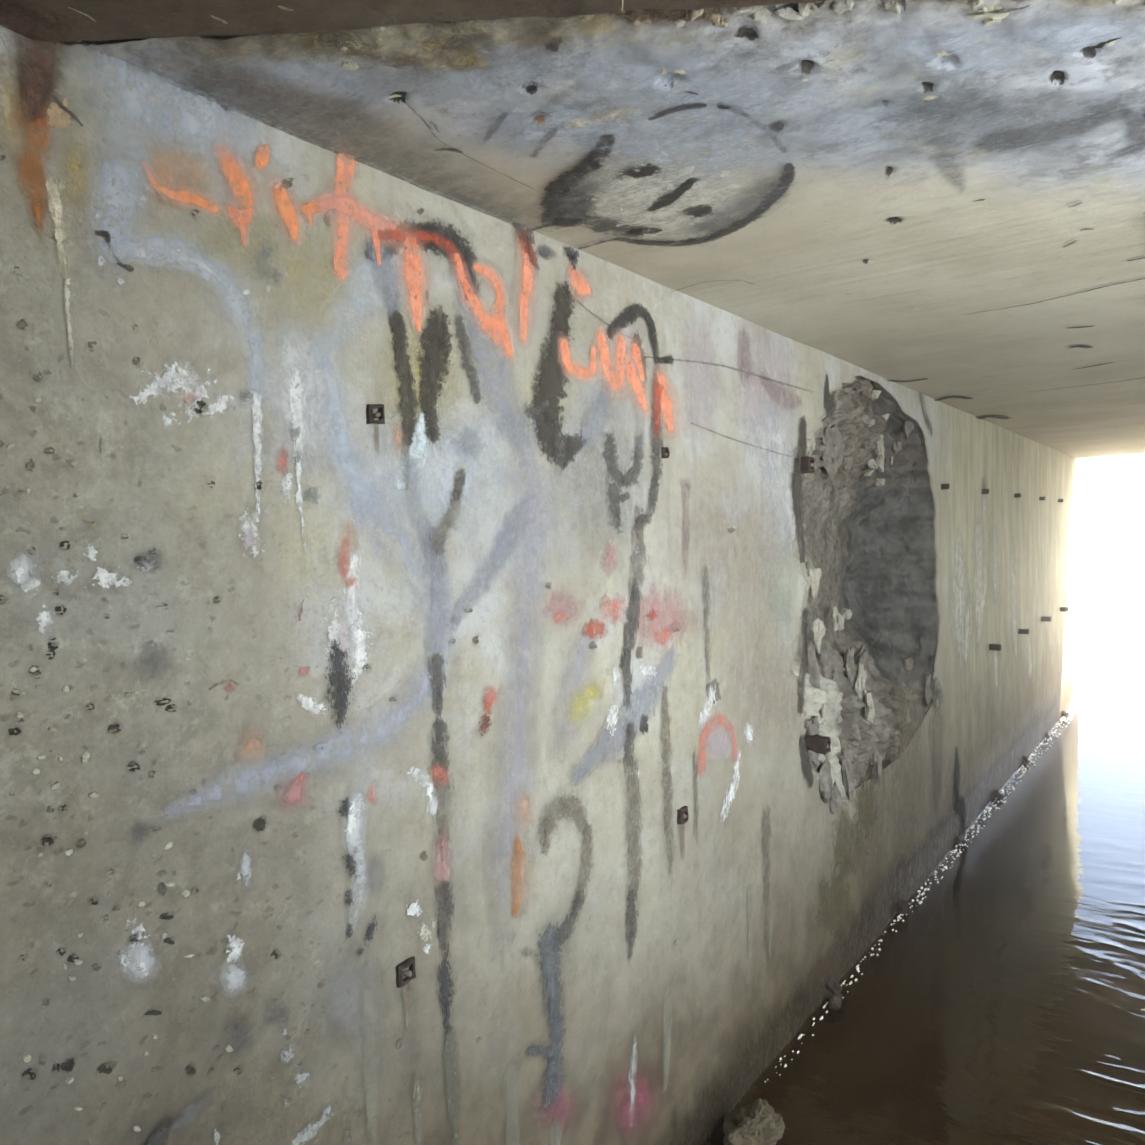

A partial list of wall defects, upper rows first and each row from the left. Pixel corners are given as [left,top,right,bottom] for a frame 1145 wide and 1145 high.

corrosion [0,36,72,229]
crack [1063,202,1094,247]
crack [965,257,1145,315]
crack [1039,325,1145,391]
crack [887,378,1011,430]
spalling [785,374,944,814]